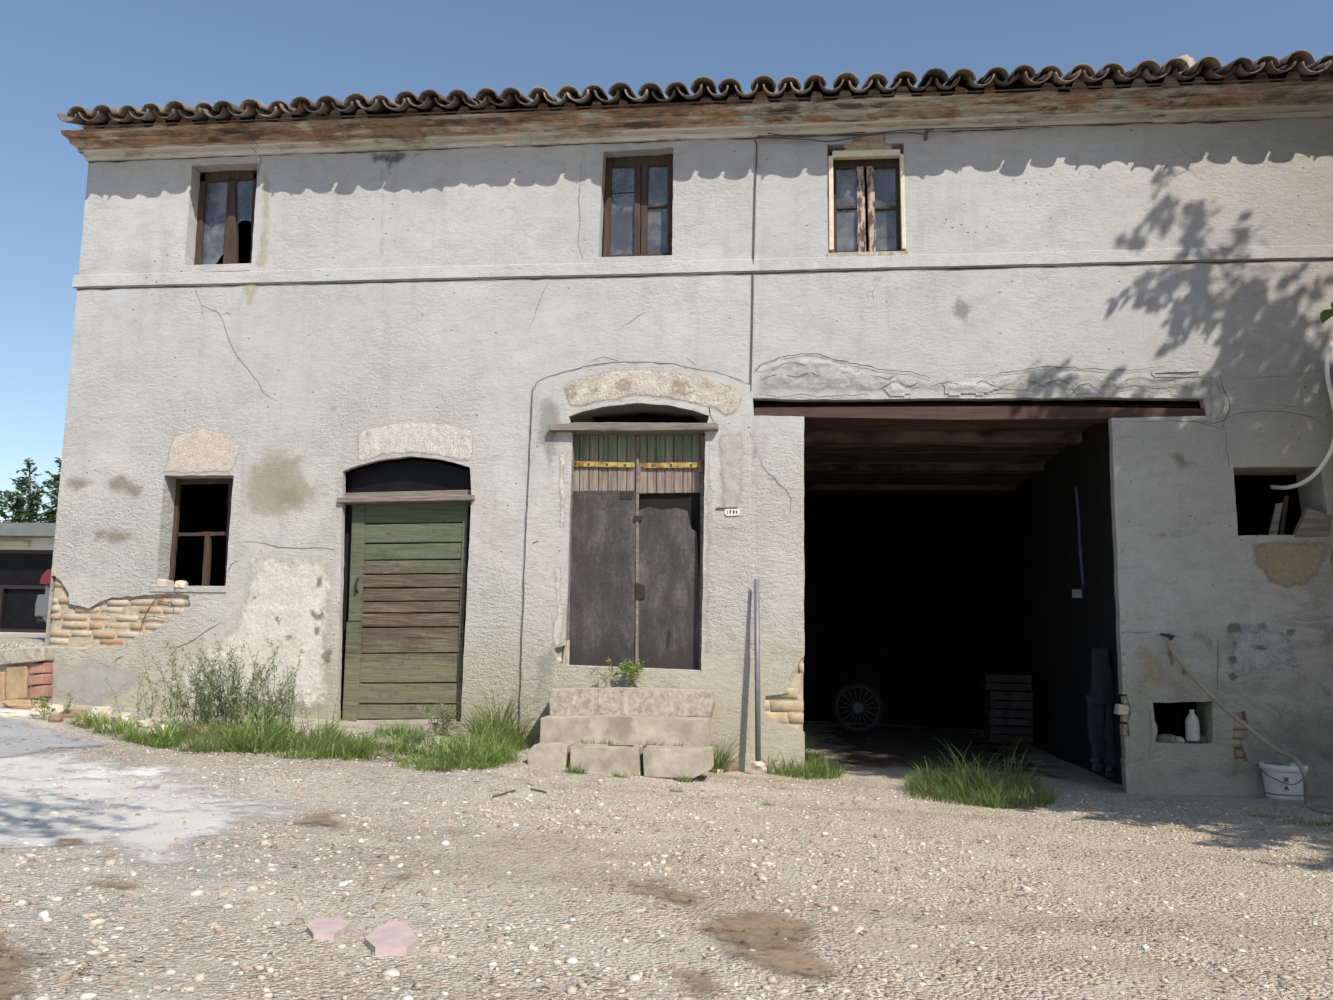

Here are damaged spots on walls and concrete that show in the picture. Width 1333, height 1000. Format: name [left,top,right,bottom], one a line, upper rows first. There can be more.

crack [194,286,277,401]
spalling [1254,541,1326,587]
spalling [49,577,190,649]
peeling [180,555,332,708]
spalling [764,656,804,731]